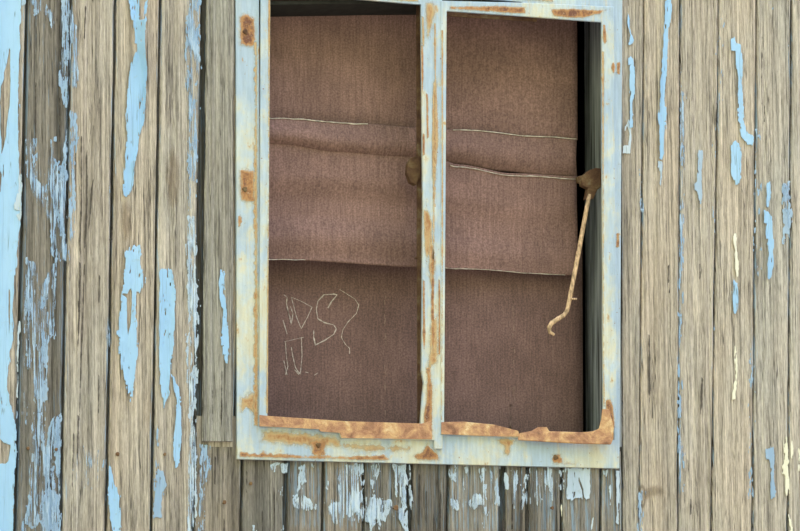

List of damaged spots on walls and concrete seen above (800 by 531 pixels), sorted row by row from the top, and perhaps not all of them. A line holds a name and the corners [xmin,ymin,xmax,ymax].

peeling [0,0,79,531]
peeling [106,245,146,402]
peeling [123,0,148,197]
peeling [159,0,212,531]
rust [240,14,269,426]
rust [421,3,443,425]
rust [543,0,602,18]
peeling [715,37,793,279]
rust [240,431,438,460]
peeling [293,463,413,531]
rust [499,439,514,455]
peeling [449,465,590,528]